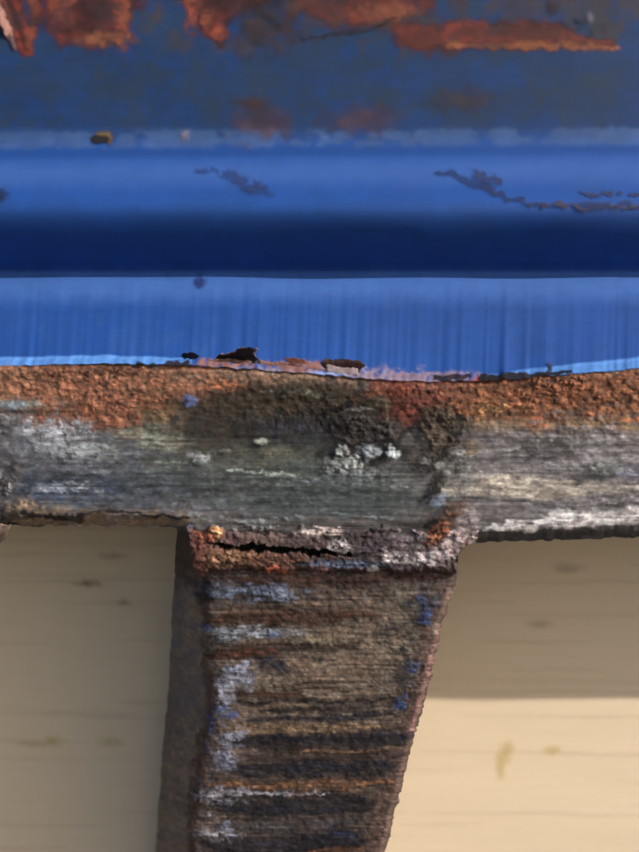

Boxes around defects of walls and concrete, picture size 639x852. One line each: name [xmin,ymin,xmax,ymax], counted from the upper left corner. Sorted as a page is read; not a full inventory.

rust [0,0,140,56]
rust [183,0,291,48]
rust [288,0,620,52]
rust [0,363,187,432]
leakage [183,383,376,463]
rust [384,371,639,430]
crack [19,509,190,524]
peeling [0,397,455,543]
leakage [433,441,477,506]
peeling [301,425,639,572]
crack [203,538,382,559]